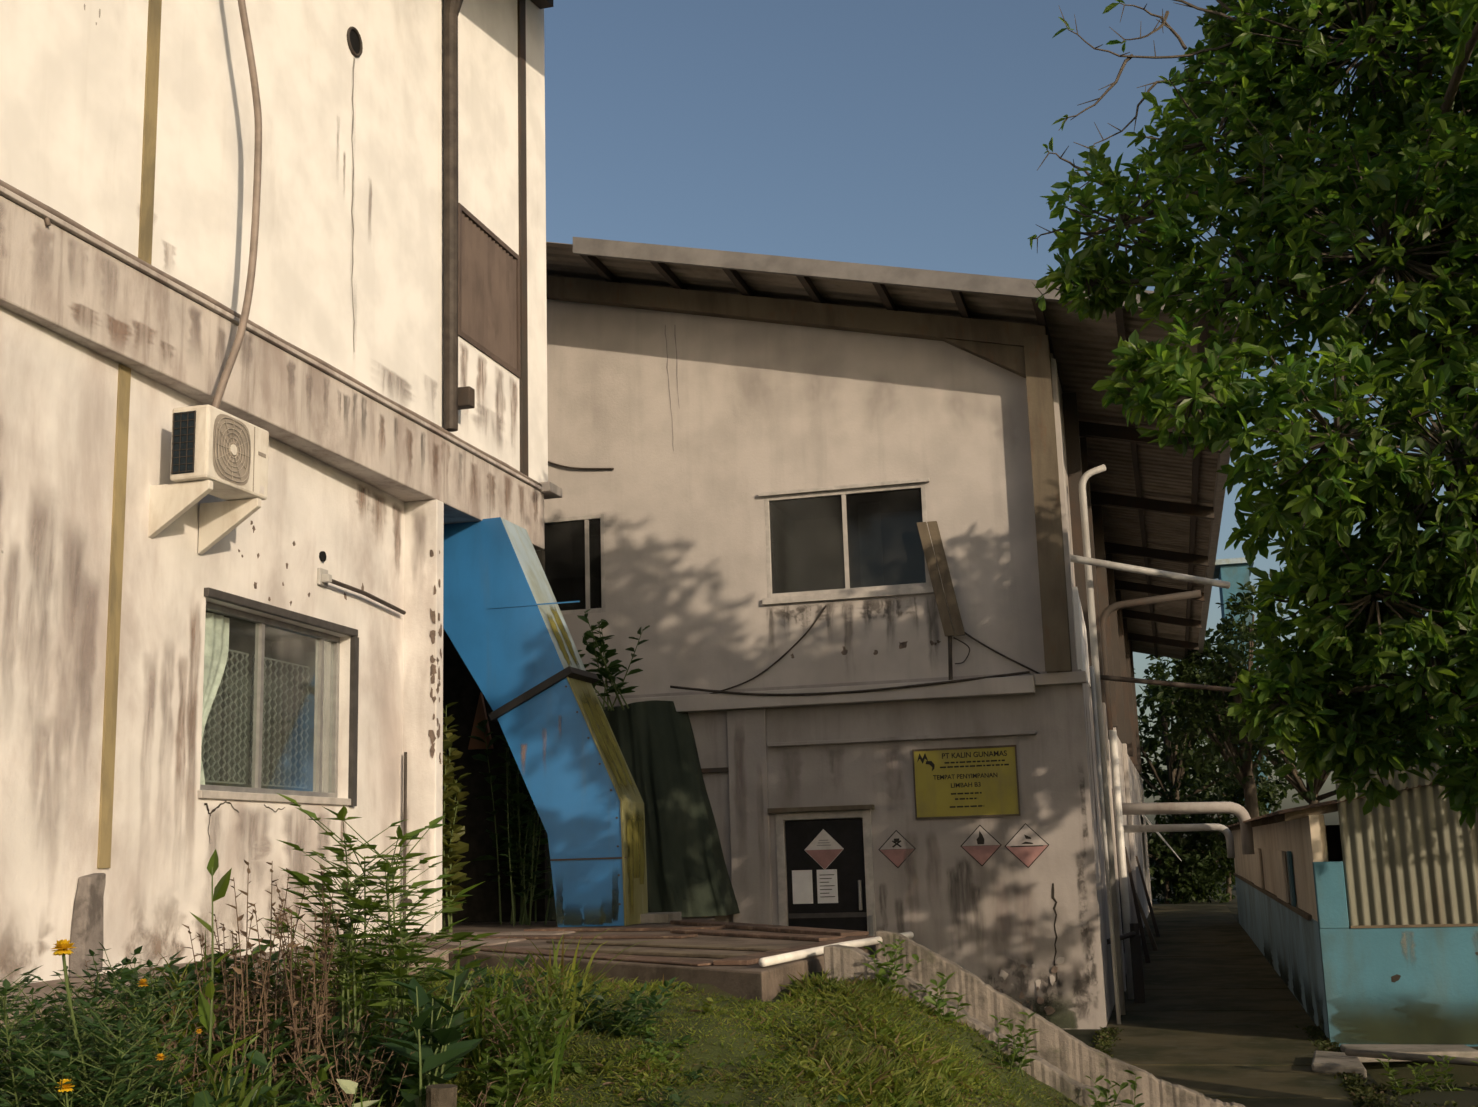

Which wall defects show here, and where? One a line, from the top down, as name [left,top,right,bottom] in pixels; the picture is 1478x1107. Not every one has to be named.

water stain [344,58,372,342]
water stain [109,317,164,348]
water stain [192,310,200,336]
water stain [409,433,438,471]
water stain [32,515,51,573]
water stain [71,554,96,690]
water stain [770,605,828,628]
spalling [428,579,442,764]
water stain [143,933,184,968]
water stain [1028,928,1096,1029]
water stain [1264,945,1478,1044]